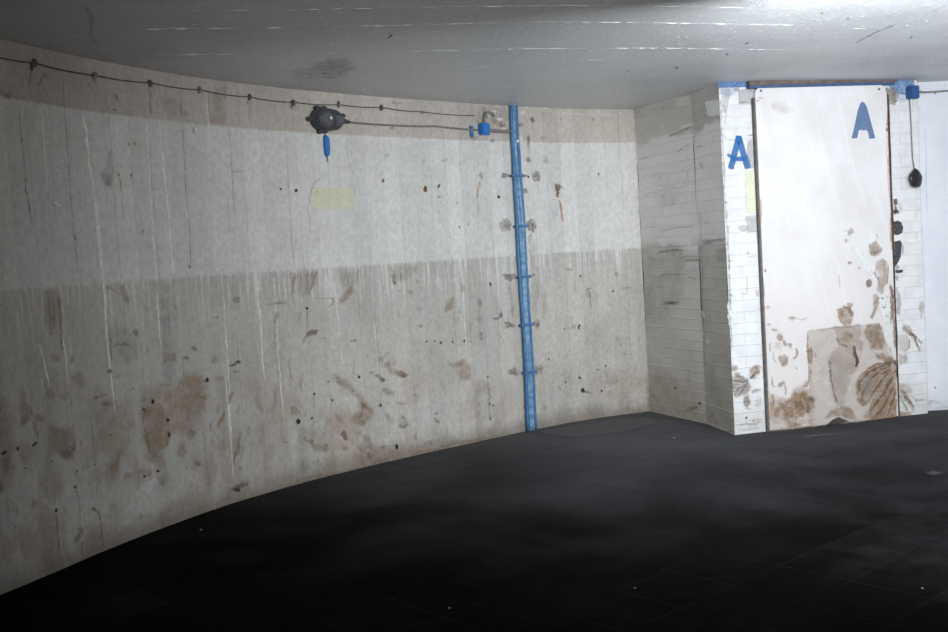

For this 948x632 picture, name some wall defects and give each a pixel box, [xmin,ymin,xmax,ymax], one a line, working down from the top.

peeling [879,286,902,347]